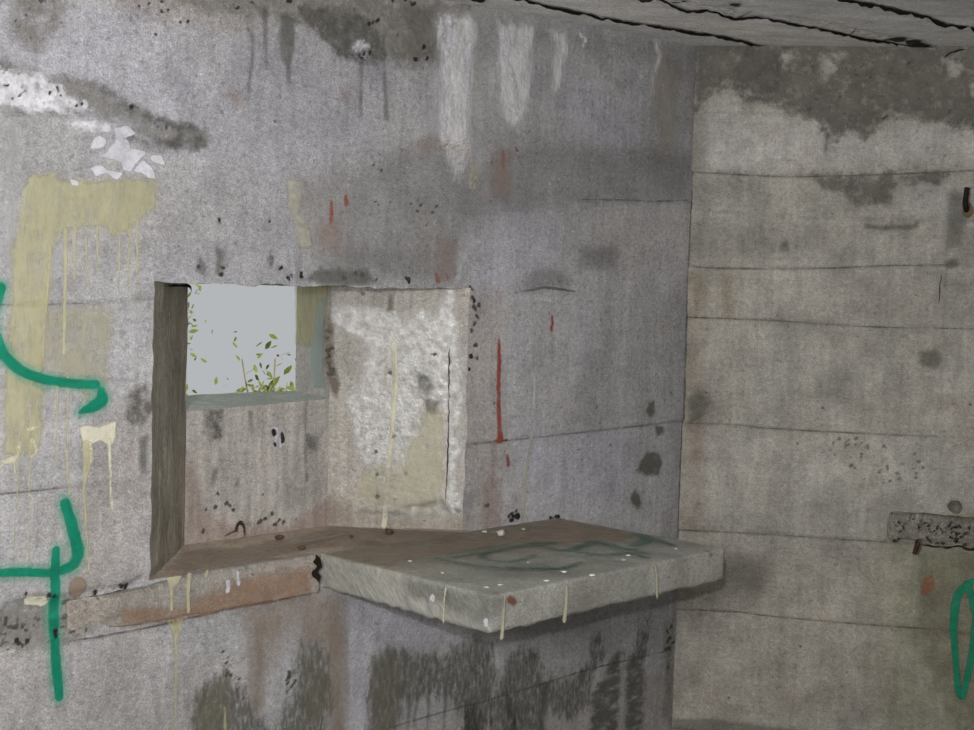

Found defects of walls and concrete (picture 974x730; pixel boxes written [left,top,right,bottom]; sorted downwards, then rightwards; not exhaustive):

leakage [0,67,111,132]
peeling [12,81,206,180]
leakage [281,5,386,63]
leakage [436,13,477,179]
leakage [498,22,534,126]
leakage [551,31,568,93]
crack [515,0,974,58]
leakage [694,45,974,143]
leakage [816,171,895,204]
leakage [192,650,265,730]
leakage [281,643,332,730]
leakage [367,632,648,730]